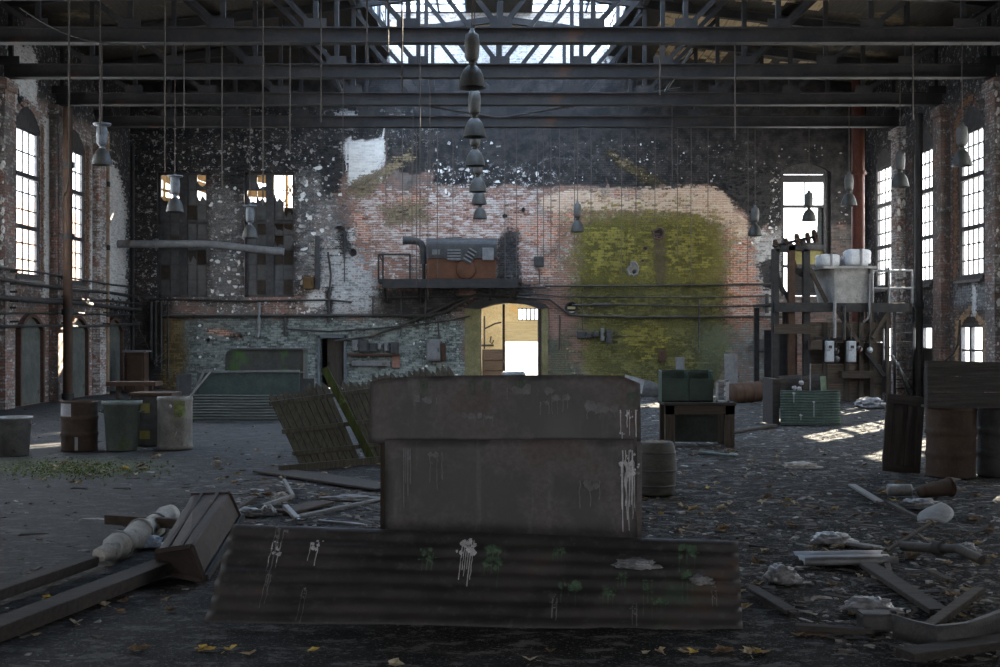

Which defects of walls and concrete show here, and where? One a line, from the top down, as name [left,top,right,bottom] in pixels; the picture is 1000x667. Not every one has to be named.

peeling [110,150,160,312]
peeling [209,186,346,322]
spalling [273,128,778,327]